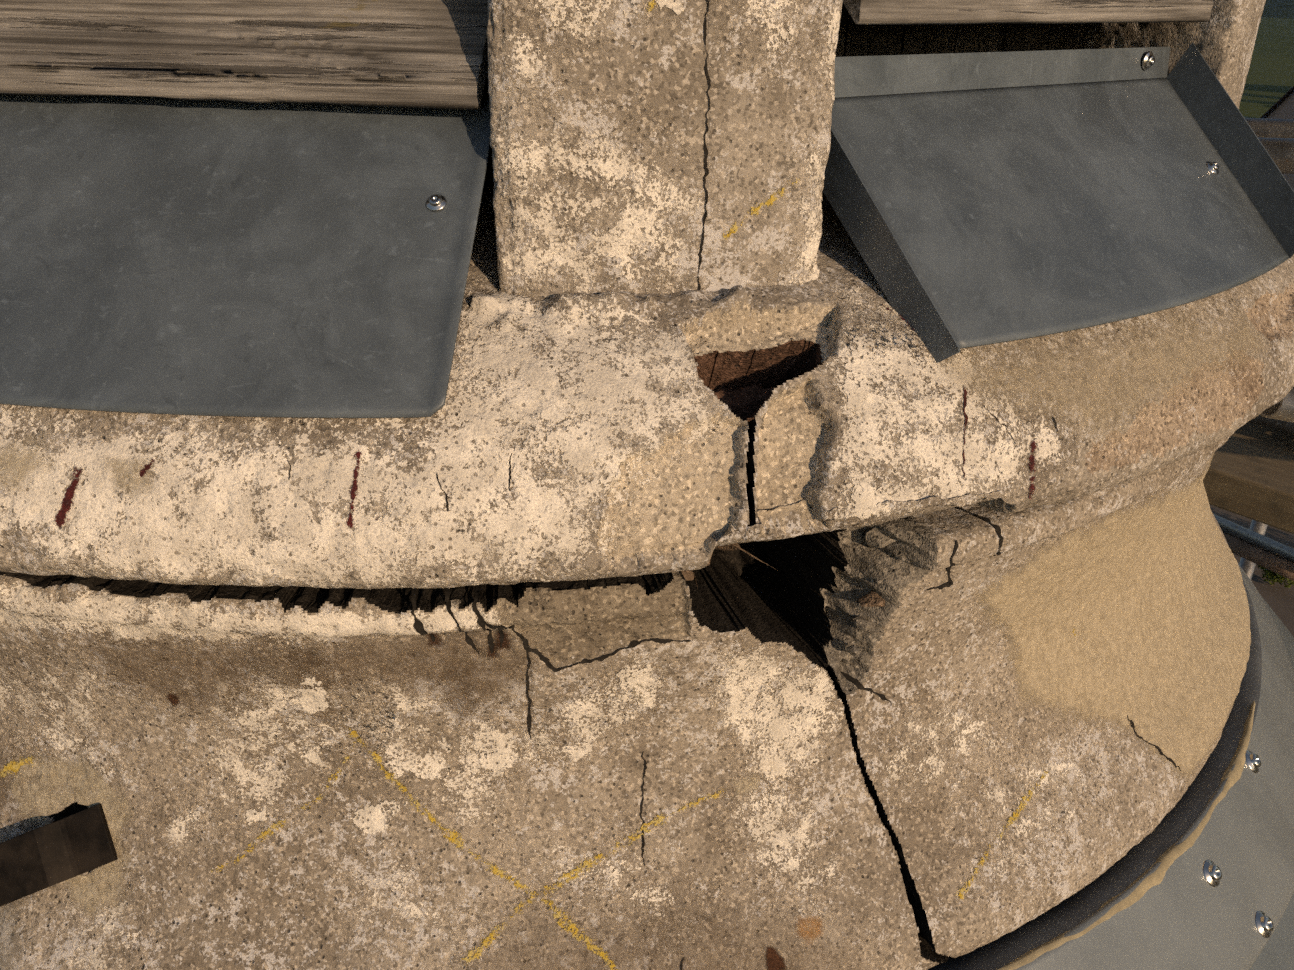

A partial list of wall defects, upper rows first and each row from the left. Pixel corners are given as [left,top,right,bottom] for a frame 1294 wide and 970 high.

crack [698,0,711,290]
spalling [1244,283,1294,342]
peeling [0,102,1065,936]
crack [746,418,757,532]
crack [411,585,691,739]
crack [639,751,647,866]
crack [799,637,955,964]
peeling [977,738,1107,885]